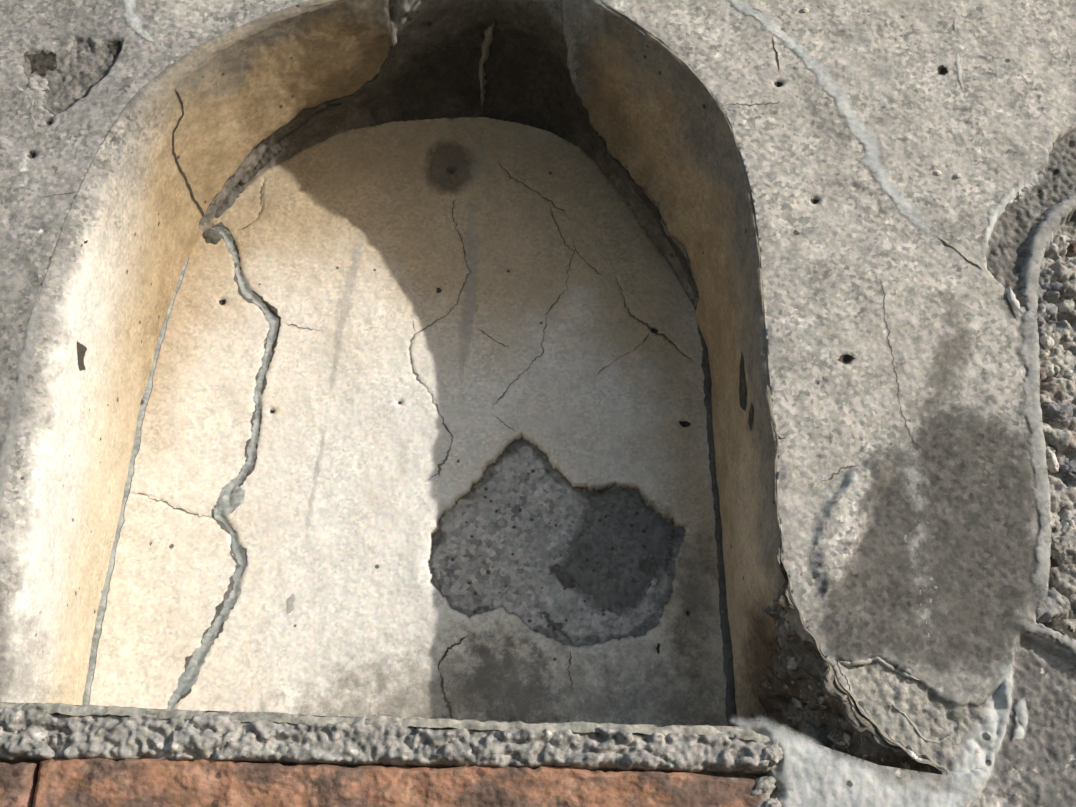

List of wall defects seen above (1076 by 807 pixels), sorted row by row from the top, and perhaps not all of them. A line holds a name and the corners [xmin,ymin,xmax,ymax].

spalling [16,38,121,134]
crack [82,91,313,709]
crack [409,200,471,481]
spalling [428,436,685,647]
crack [489,162,739,727]
spalling [760,534,998,775]
water stain [819,408,1038,670]
spalling [1006,202,1076,531]
spalling [1036,543,1076,637]